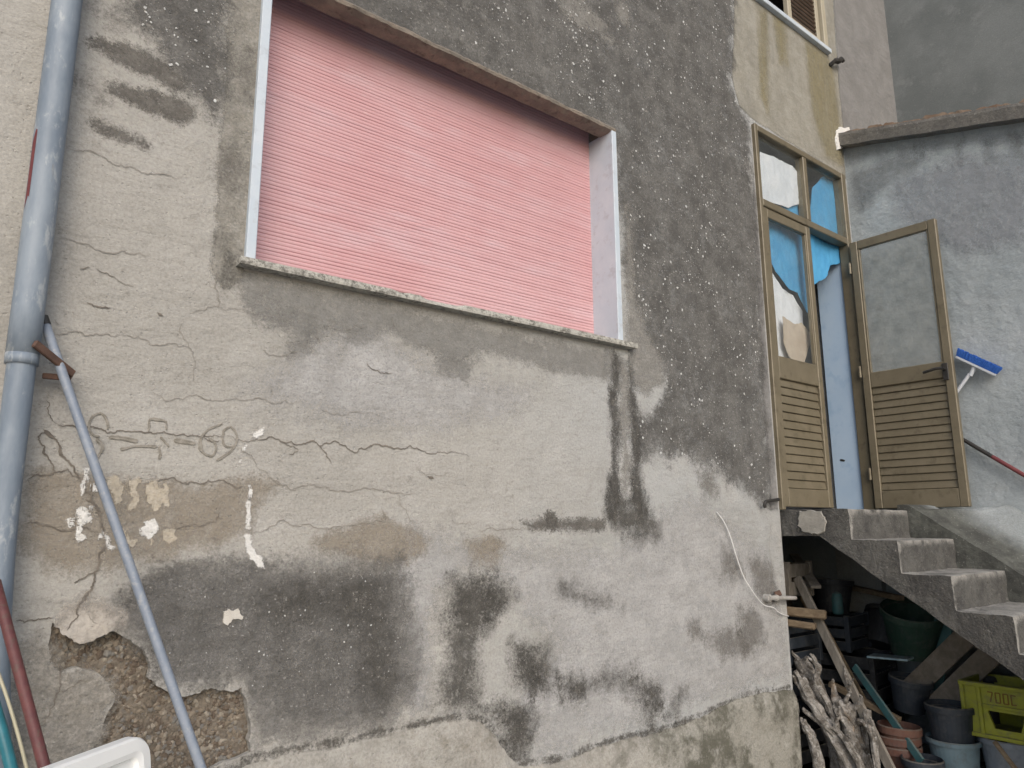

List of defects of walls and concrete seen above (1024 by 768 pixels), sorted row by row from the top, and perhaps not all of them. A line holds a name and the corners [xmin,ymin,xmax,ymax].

damp [87,37,194,123]
crack [65,148,174,178]
crack [59,238,145,286]
crack [55,275,297,404]
damp [222,257,660,539]
peeling [80,468,98,496]
peeling [125,478,170,511]
crack [27,401,467,610]
spalling [12,682,37,768]
spalling [23,592,248,768]
damp [21,472,425,743]
damp [441,578,533,756]